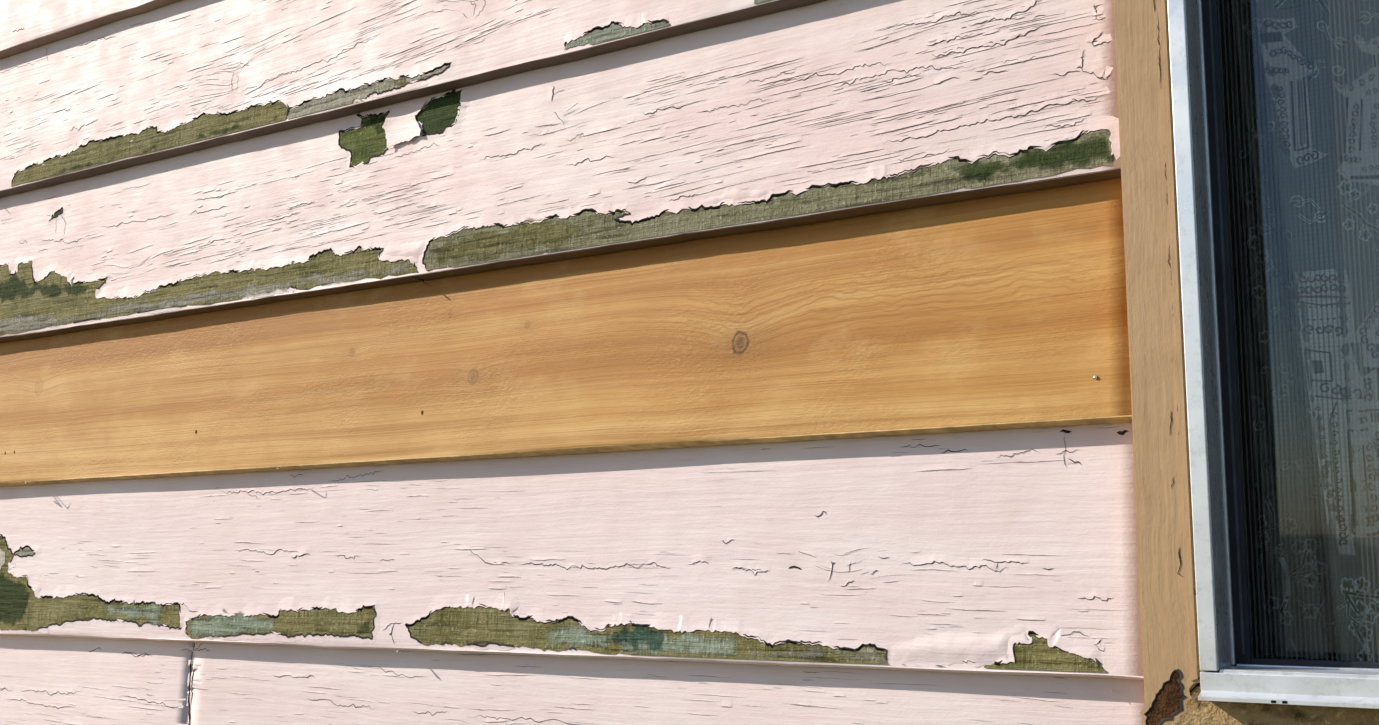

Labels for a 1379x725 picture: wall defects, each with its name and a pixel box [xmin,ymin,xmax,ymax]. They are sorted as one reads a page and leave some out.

peeling [563,12,670,50]
crack [1153,0,1161,81]
peeling [10,57,471,186]
crack [0,0,1113,281]
peeling [0,116,1120,335]
crack [891,423,1129,472]
peeling [0,528,381,644]
crack [0,468,1125,725]
peeling [401,592,946,667]
peeling [984,622,1107,673]